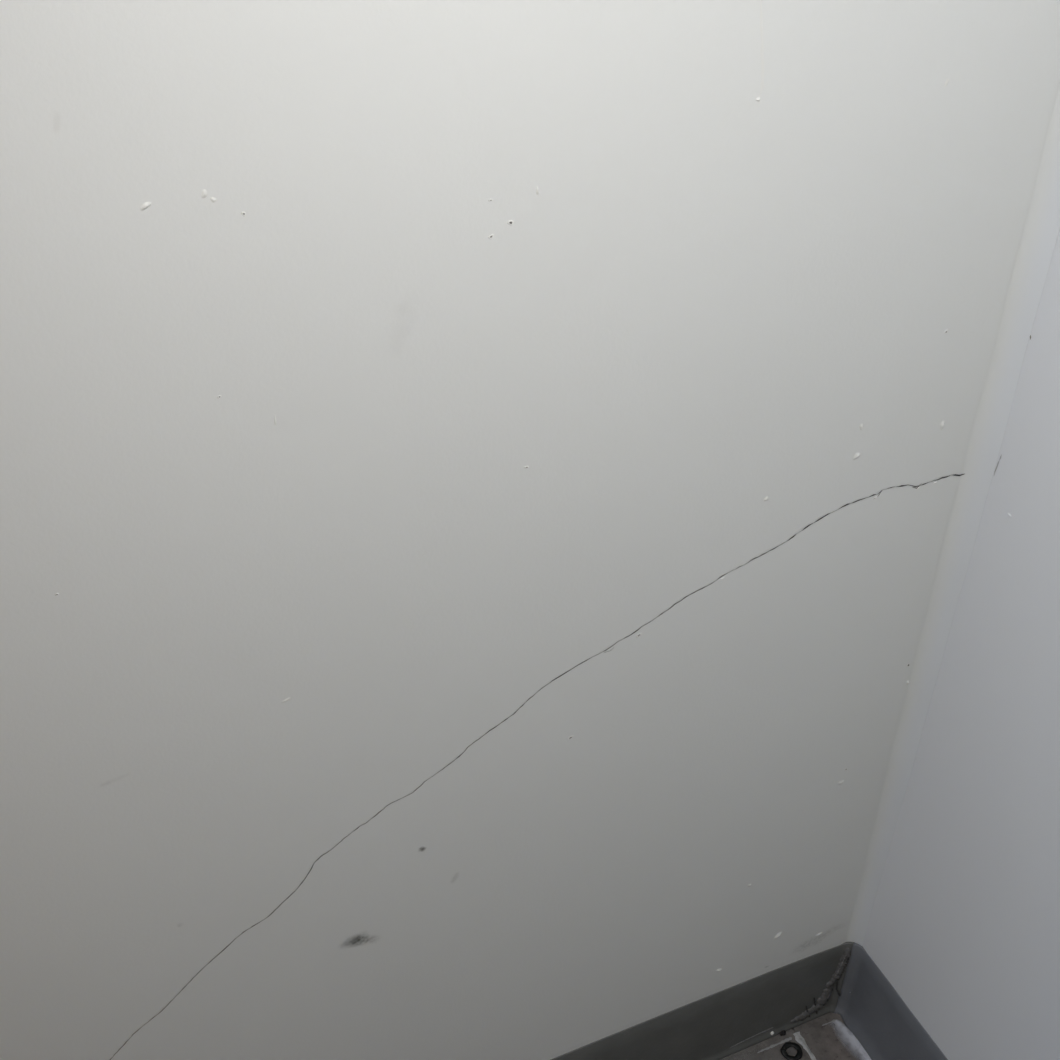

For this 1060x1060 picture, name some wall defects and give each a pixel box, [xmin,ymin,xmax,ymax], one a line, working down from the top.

crack [110,474,964,1060]